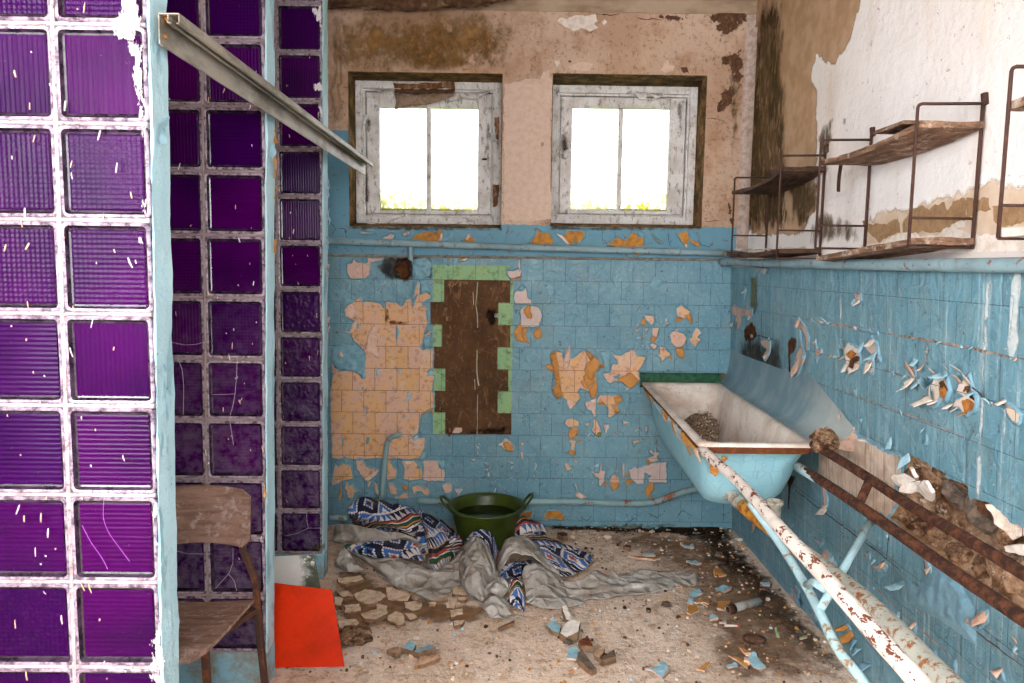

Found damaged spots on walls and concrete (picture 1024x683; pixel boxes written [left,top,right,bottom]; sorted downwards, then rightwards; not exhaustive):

peeling [558,14,607,31]
damp [330,14,511,119]
damp [707,0,1024,245]
peeling [607,231,664,256]
flaking render [860,197,1024,253]
spalling [837,326,882,375]
peeling [329,280,463,500]
peeling [545,303,707,499]
spalling [896,356,984,418]
peeling [994,397,1023,427]
corrosion [737,499,770,537]
spalling [853,418,1024,608]